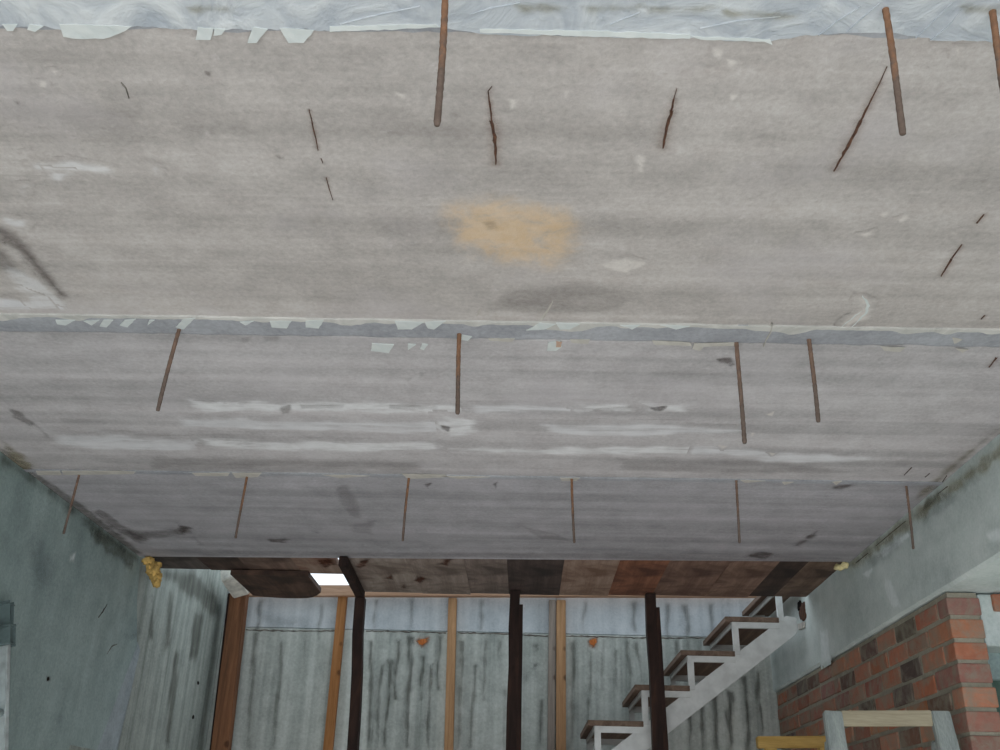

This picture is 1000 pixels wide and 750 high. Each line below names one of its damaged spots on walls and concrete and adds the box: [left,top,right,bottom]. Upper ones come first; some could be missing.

leakage [0,246,80,314]